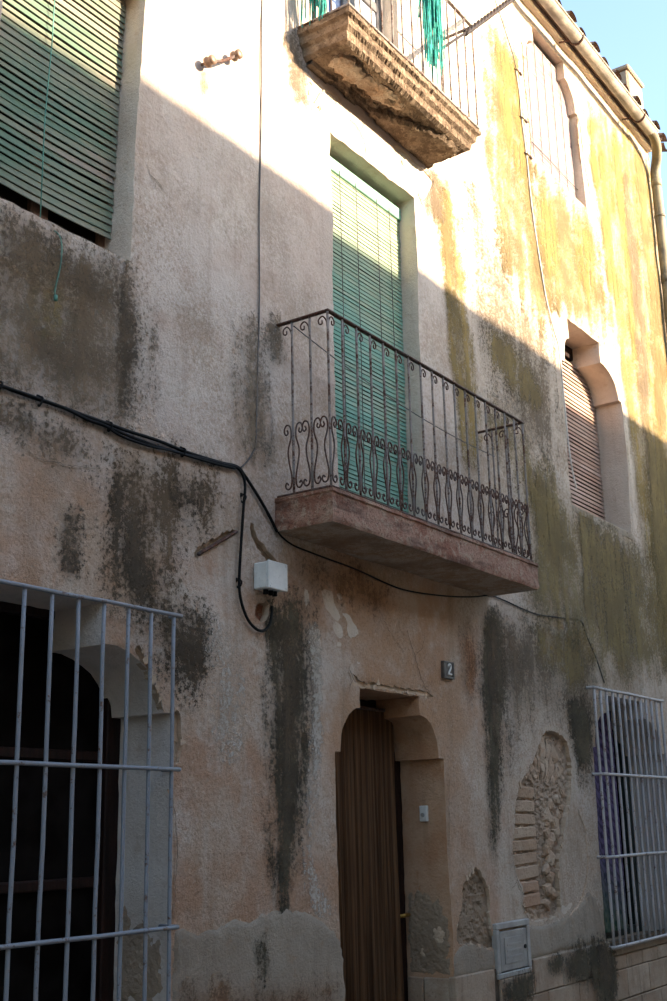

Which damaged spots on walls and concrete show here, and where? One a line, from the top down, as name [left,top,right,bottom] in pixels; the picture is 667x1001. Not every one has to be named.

leakage [280,25,312,113]
leakage [0,198,245,764]
leakage [424,15,667,852]
peeling [321,589,358,647]
leakage [258,586,337,917]
flaking render [513,730,572,922]
flaking render [116,906,163,1001]
flaking render [408,867,493,975]
leakage [502,967,537,1001]
leakage [548,933,619,1001]